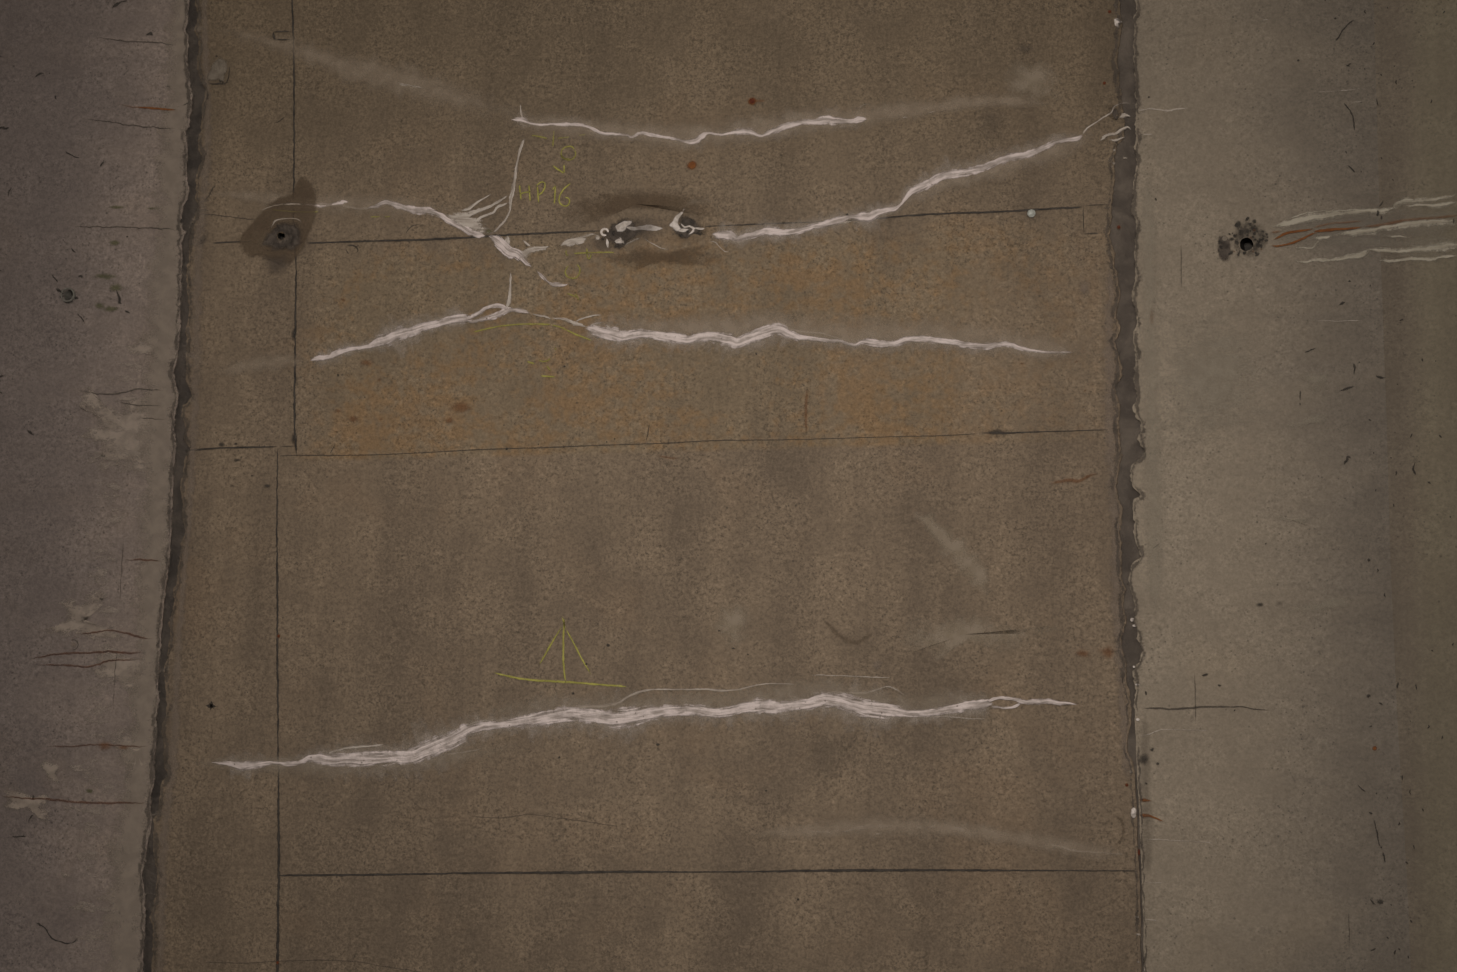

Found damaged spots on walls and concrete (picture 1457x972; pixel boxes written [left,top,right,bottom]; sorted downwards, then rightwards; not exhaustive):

leakage [225,66,1070,371]